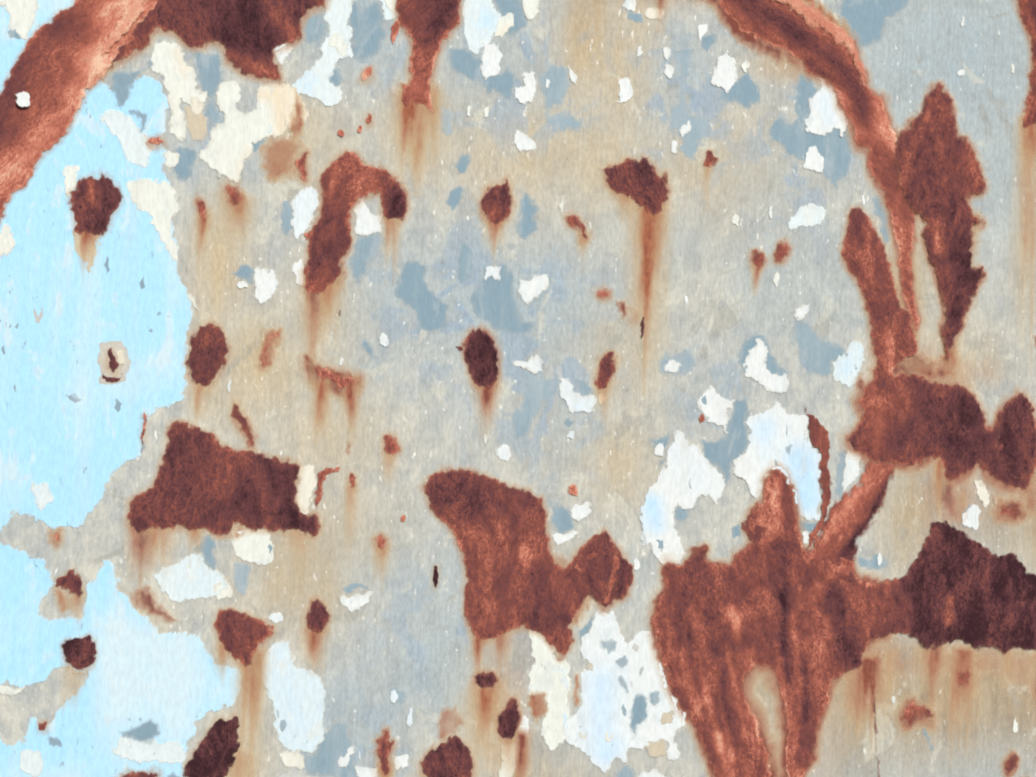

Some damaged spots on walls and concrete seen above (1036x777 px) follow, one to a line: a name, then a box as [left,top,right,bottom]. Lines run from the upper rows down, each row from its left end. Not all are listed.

rust [0,0,327,222]
peeling [0,0,396,777]
rust [127,403,355,566]
rust [286,151,408,423]
peeling [639,335,821,565]
peeling [788,203,826,230]
peeling [770,75,851,187]
rust [650,0,1036,777]
rust [183,608,274,777]
peeling [394,754,409,770]
rust [421,468,634,777]
peeling [498,611,686,777]